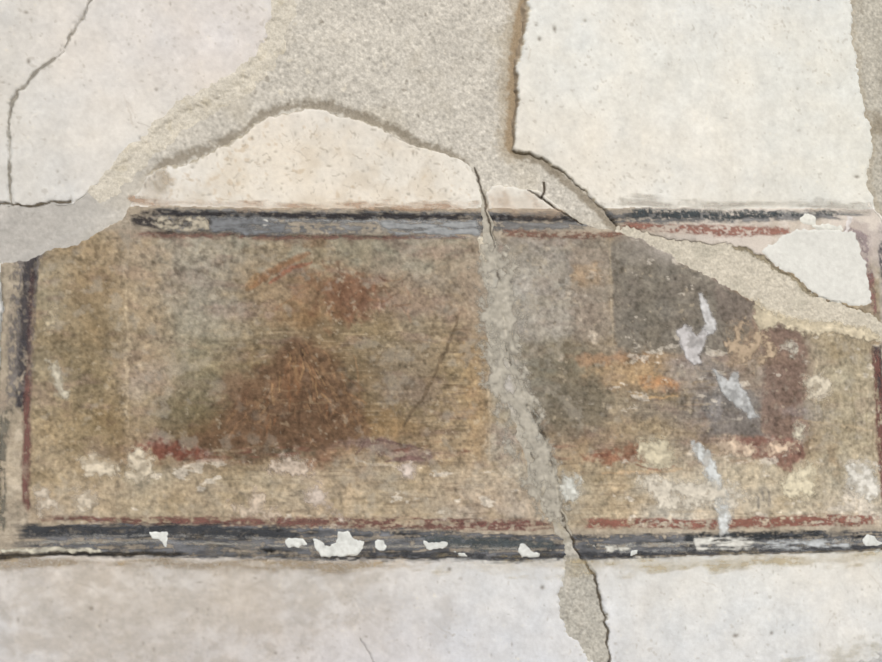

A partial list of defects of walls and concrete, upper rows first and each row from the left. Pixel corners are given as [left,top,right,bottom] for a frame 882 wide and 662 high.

crack [8,0,91,129]
crack [0,161,71,207]
flaking render [0,0,882,342]
crack [474,167,611,662]
peeling [285,531,364,558]
peeling [375,539,386,551]
peeling [423,540,467,557]
peeling [518,543,540,558]